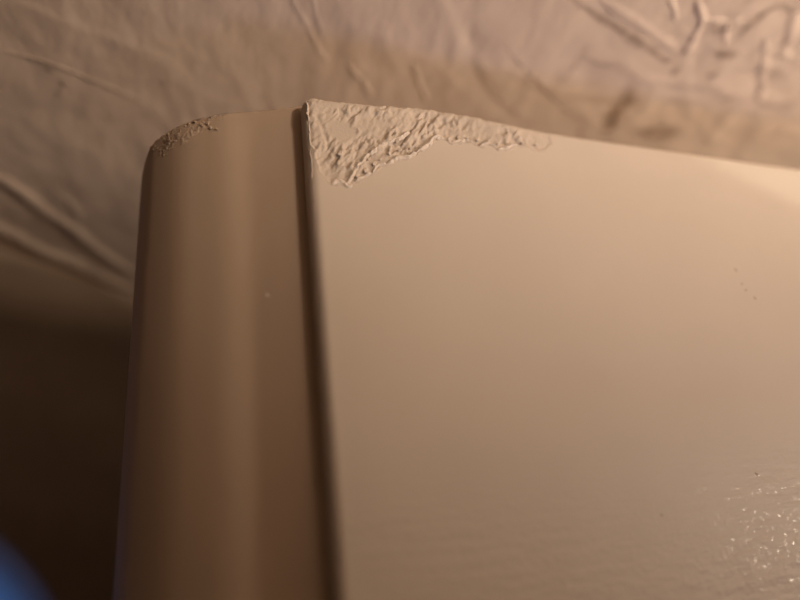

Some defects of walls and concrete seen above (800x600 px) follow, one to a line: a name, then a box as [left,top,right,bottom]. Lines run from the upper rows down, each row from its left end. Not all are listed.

spalling [306,99,553,215]